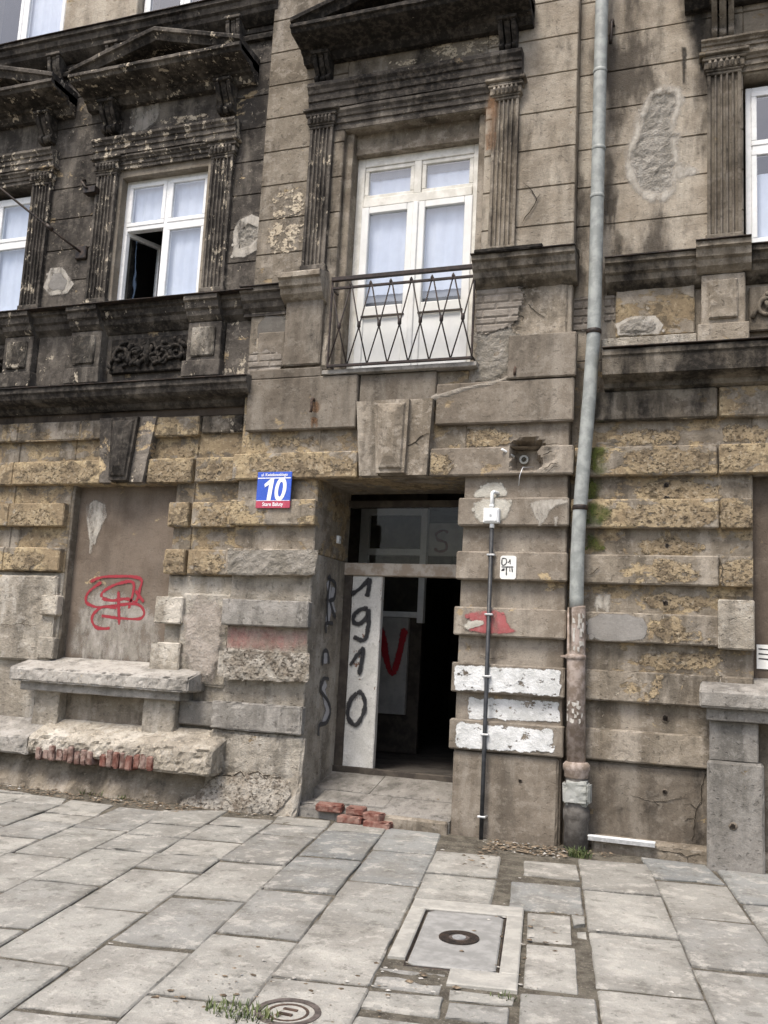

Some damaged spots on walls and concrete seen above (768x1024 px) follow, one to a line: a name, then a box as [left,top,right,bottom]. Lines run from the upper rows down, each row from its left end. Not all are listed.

peeling [160,113,207,125]
spalling [625,87,696,202]
spalling [230,188,304,258]
water stain [604,157,622,251]
flaking render [468,286,524,383]
spalling [179,771,291,814]
crack [622,773,707,861]